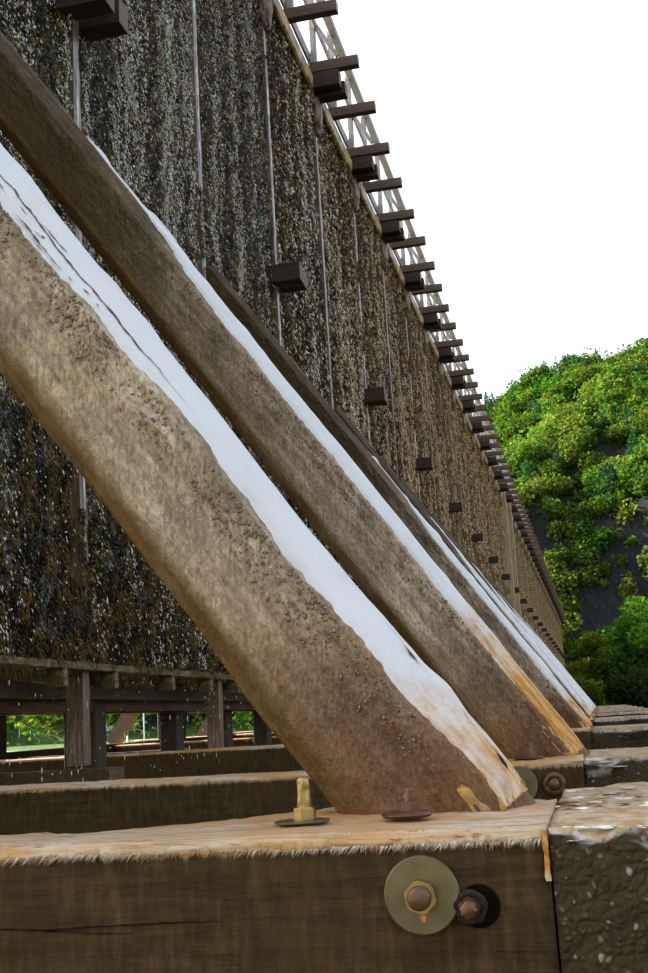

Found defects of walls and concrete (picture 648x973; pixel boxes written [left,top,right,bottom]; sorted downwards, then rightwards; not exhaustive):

corrosion [457,780,528,812]
spalling [564,825,622,842]
crack [0,921,226,934]